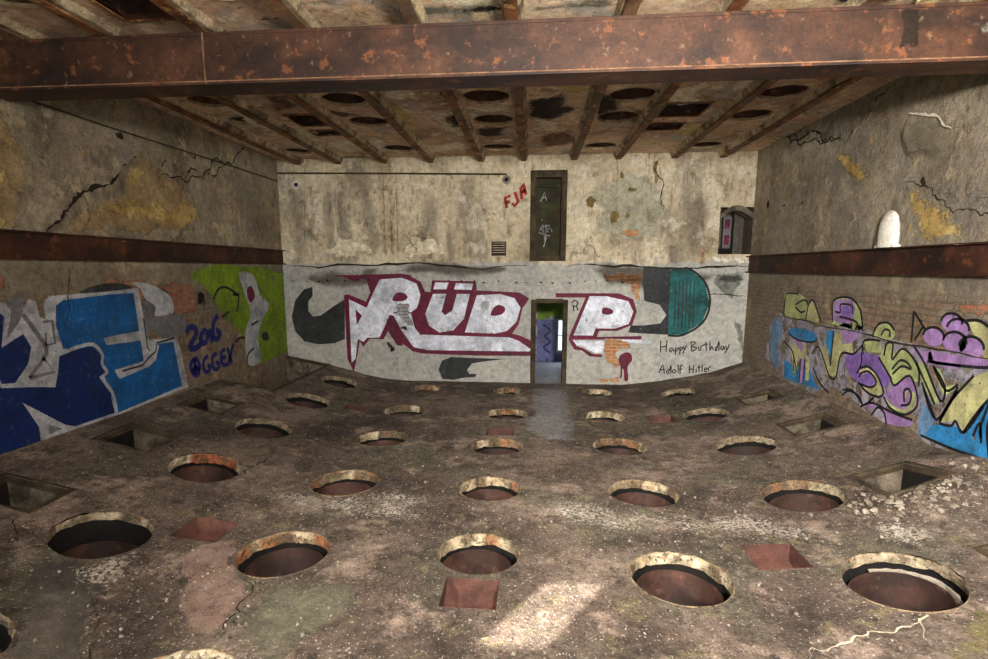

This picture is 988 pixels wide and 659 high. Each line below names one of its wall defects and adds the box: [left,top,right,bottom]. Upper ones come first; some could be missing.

peeling [0,117,36,230]
peeling [46,151,199,235]
crack [162,147,245,183]